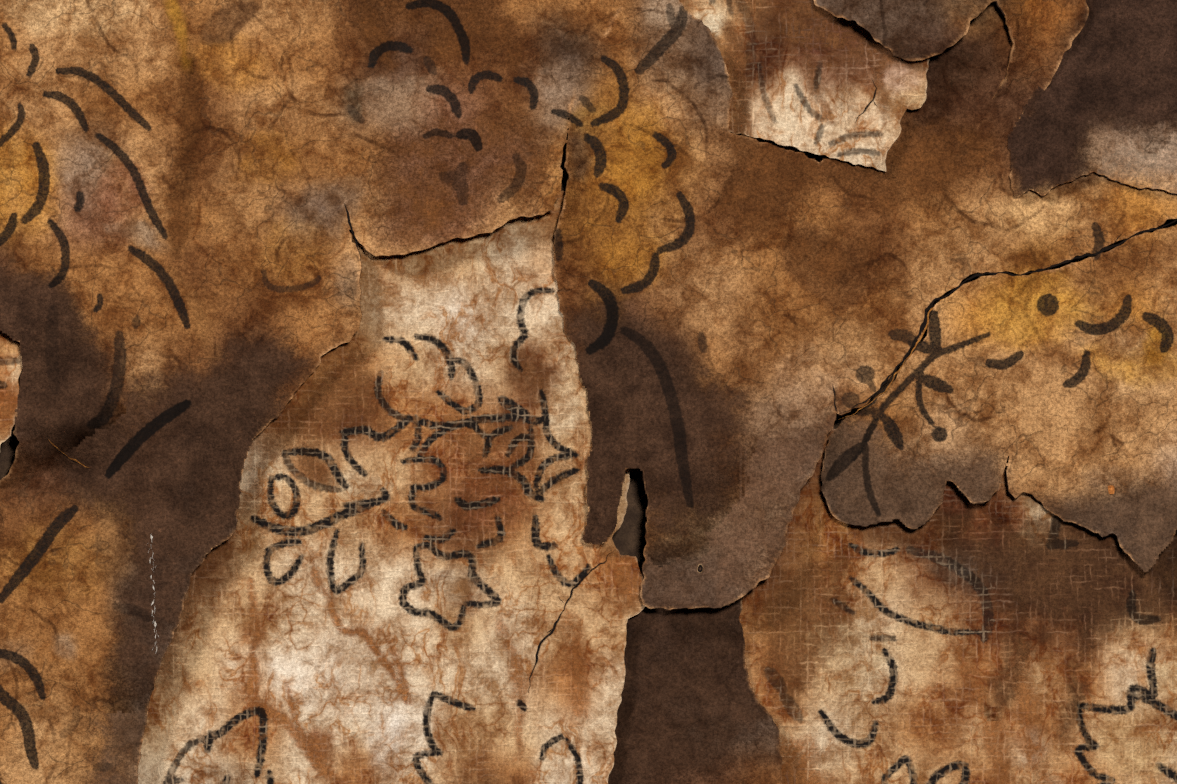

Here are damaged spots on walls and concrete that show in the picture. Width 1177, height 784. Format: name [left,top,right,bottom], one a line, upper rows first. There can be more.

damp [1008,0,1177,192]
crack [832,219,1177,417]
damp [0,273,307,691]